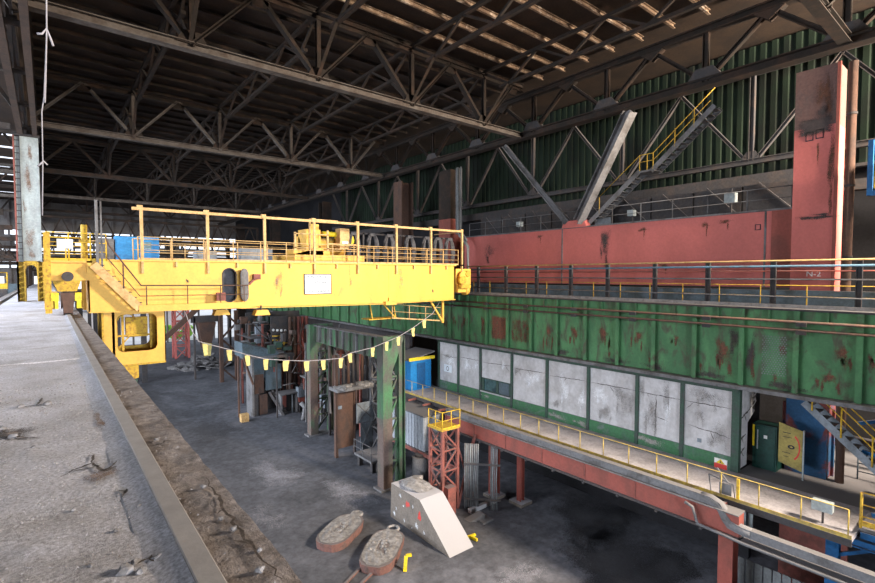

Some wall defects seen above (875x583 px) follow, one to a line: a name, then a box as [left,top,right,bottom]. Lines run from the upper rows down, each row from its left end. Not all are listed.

corrosion [23,144,32,214]
corrosion [816,134,835,214]
crack [442,354,753,456]